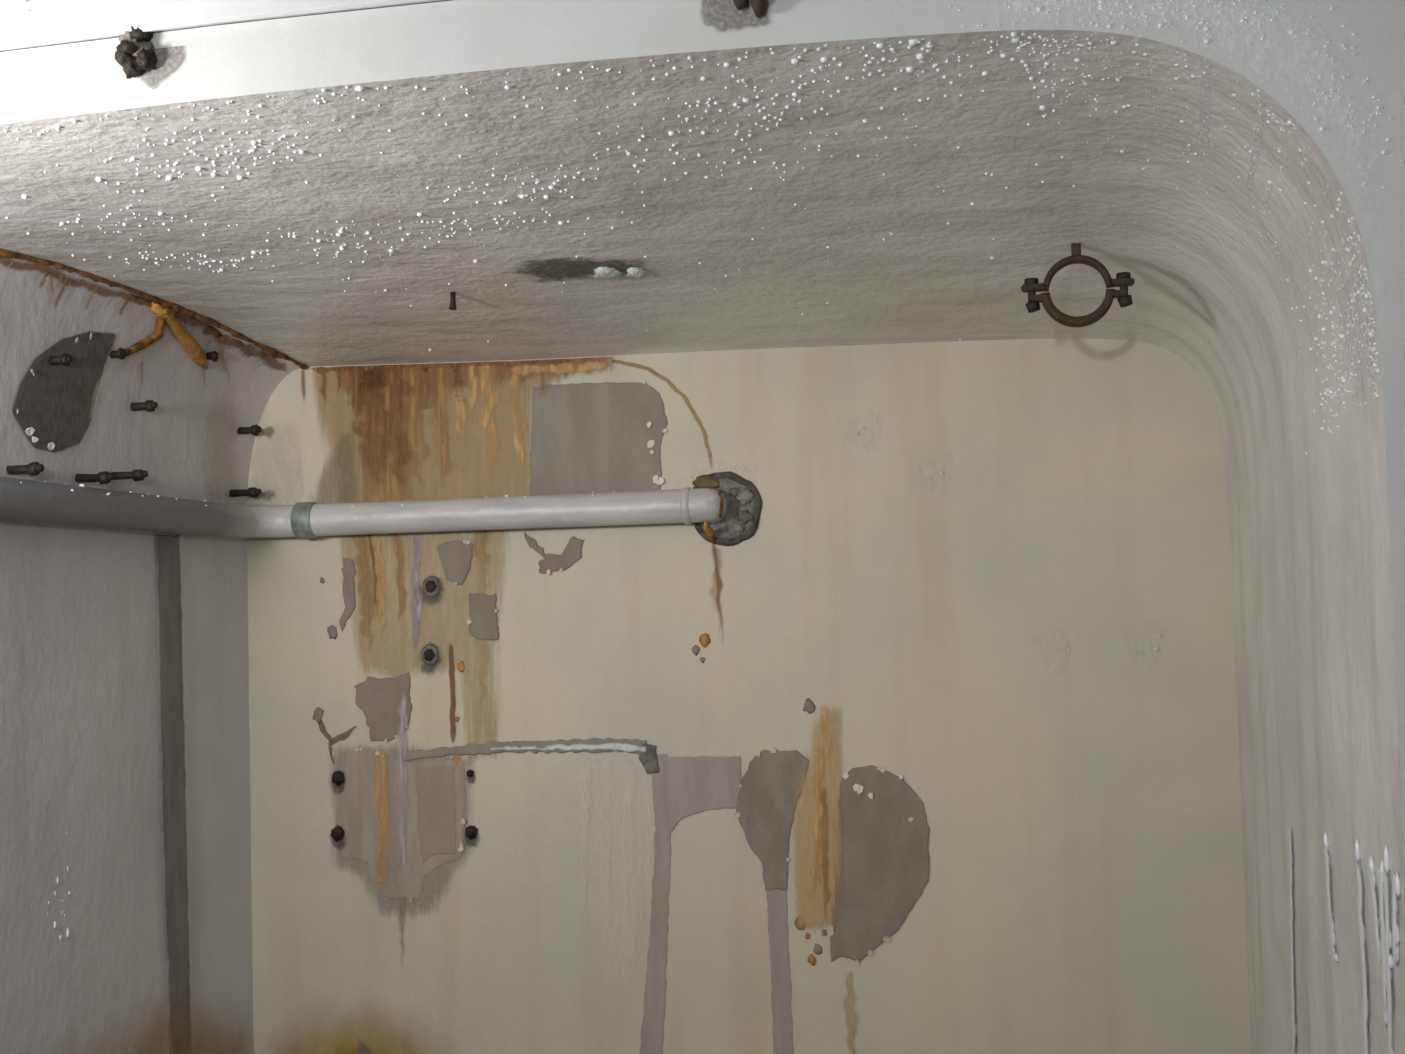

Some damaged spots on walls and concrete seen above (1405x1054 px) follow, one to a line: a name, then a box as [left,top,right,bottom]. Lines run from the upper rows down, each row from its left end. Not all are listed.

peeling [13,332,115,453]
corrosion [125,302,229,382]
corrosion [301,357,610,503]
leakage [518,259,647,281]
peeling [530,380,668,495]
corrosion [347,530,500,765]
spalling [335,672,467,931]
spalling [734,747,809,891]
corrosion [794,698,841,966]
spalling [827,765,930,965]
leakage [1323,831,1338,963]
leakage [1355,838,1401,1054]